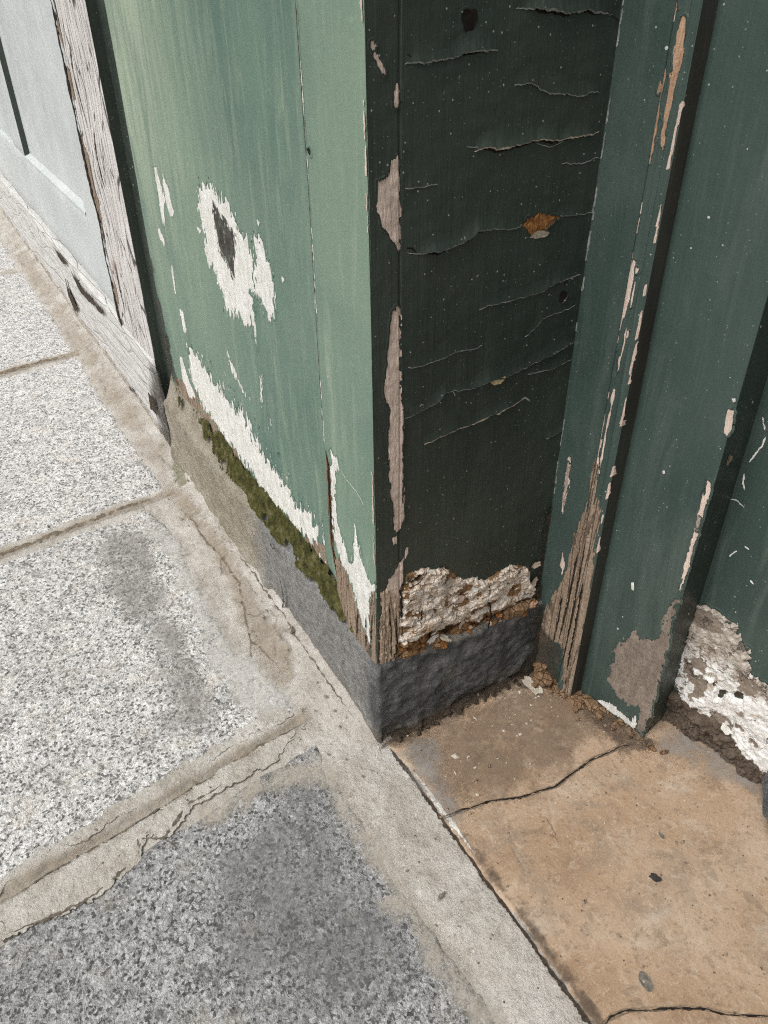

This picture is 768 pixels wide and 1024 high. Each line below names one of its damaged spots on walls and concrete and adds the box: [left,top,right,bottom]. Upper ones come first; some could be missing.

crack [405,27,499,65]
crack [467,63,601,165]
crack [516,0,619,21]
peeling [649,0,689,170]
peeling [180,2,408,645]
crack [405,266,581,445]
peeling [596,256,647,499]
peeling [554,419,574,516]
peeling [419,561,541,644]
peeling [597,478,768,784]
crack [2,724,300,936]
crack [390,741,768,1024]